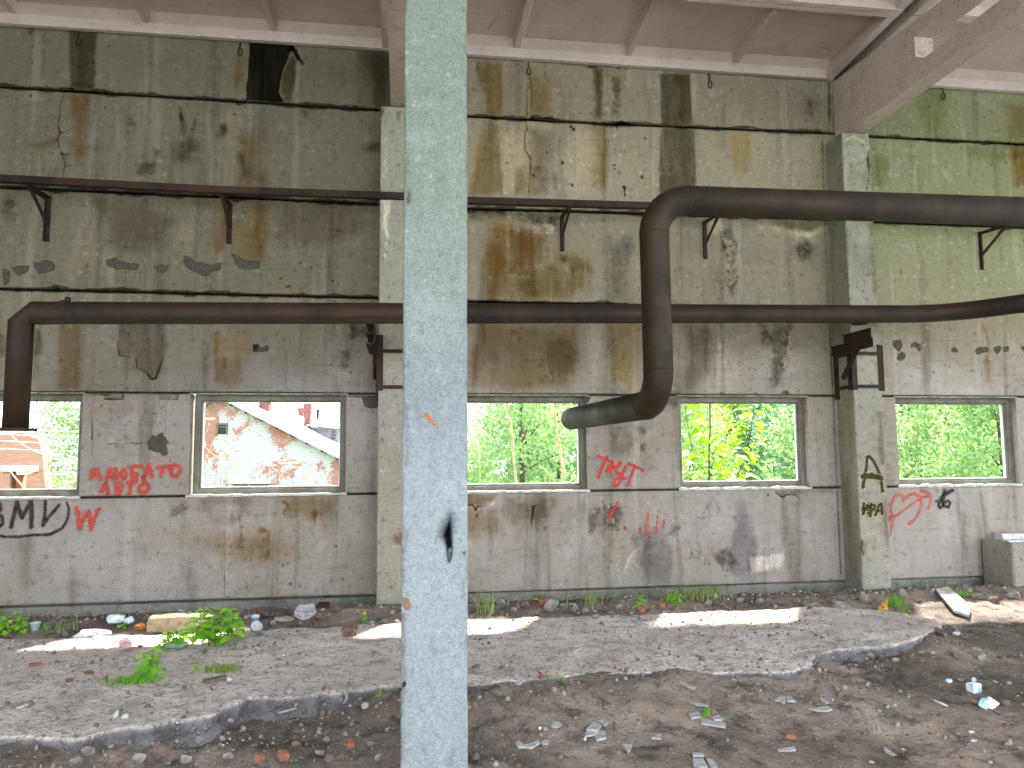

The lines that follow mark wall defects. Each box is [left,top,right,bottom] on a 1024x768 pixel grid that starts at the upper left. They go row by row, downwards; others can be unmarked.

peeling [893,339,921,361]
peeling [975,346,1024,355]